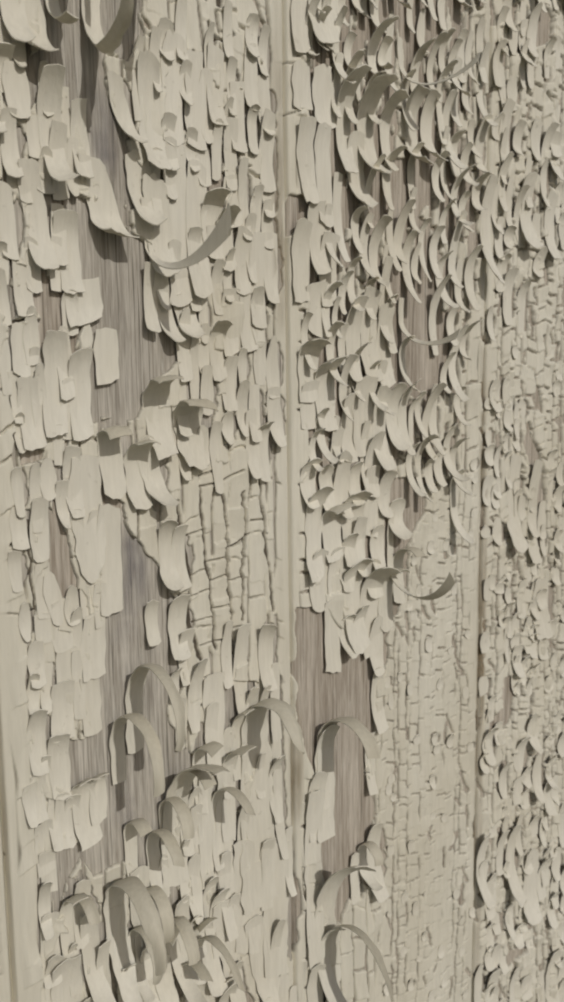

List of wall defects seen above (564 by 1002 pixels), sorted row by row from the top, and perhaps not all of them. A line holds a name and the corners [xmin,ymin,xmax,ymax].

peeling [0,0,297,1002]